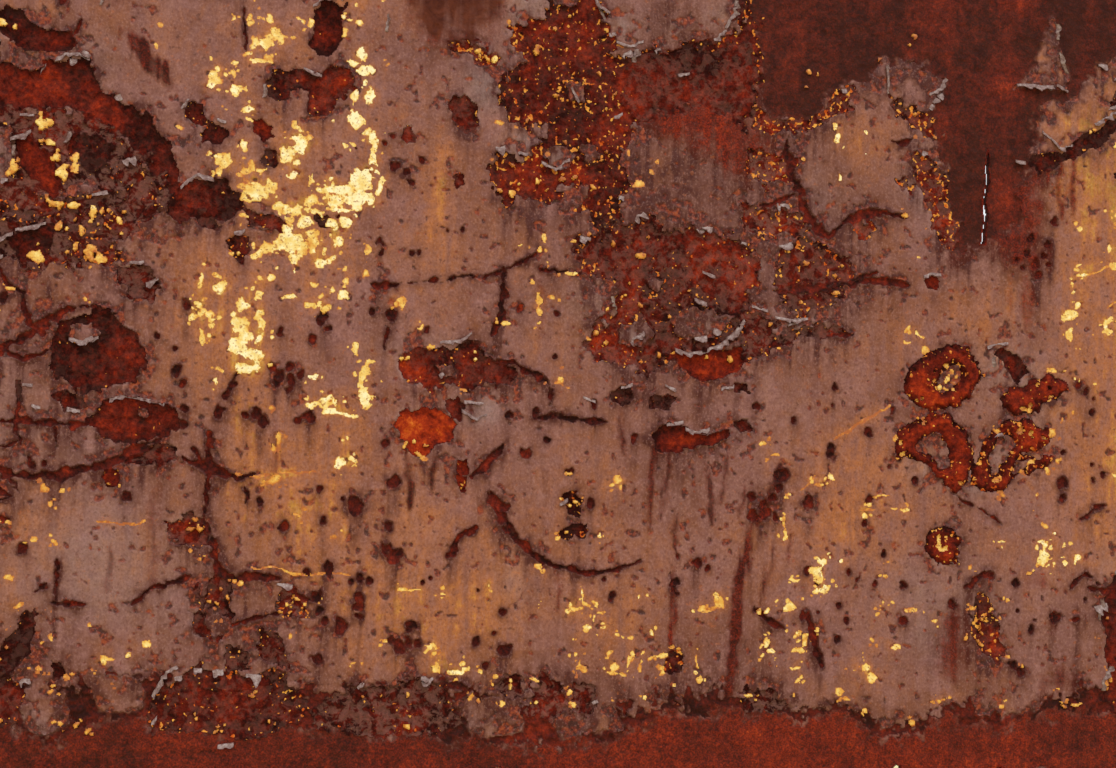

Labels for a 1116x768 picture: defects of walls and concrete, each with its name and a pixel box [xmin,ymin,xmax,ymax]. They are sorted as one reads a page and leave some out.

rust [117,25,179,94]
peeling [1015,79,1116,177]
crack [0,267,96,362]
peeling [48,297,189,501]
crack [0,400,312,627]
rust [235,424,282,480]
peeling [381,321,518,461]
crack [371,252,608,426]
crack [445,444,641,577]
peeling [447,0,856,544]
rust [895,343,1069,494]
rust [0,444,1116,768]